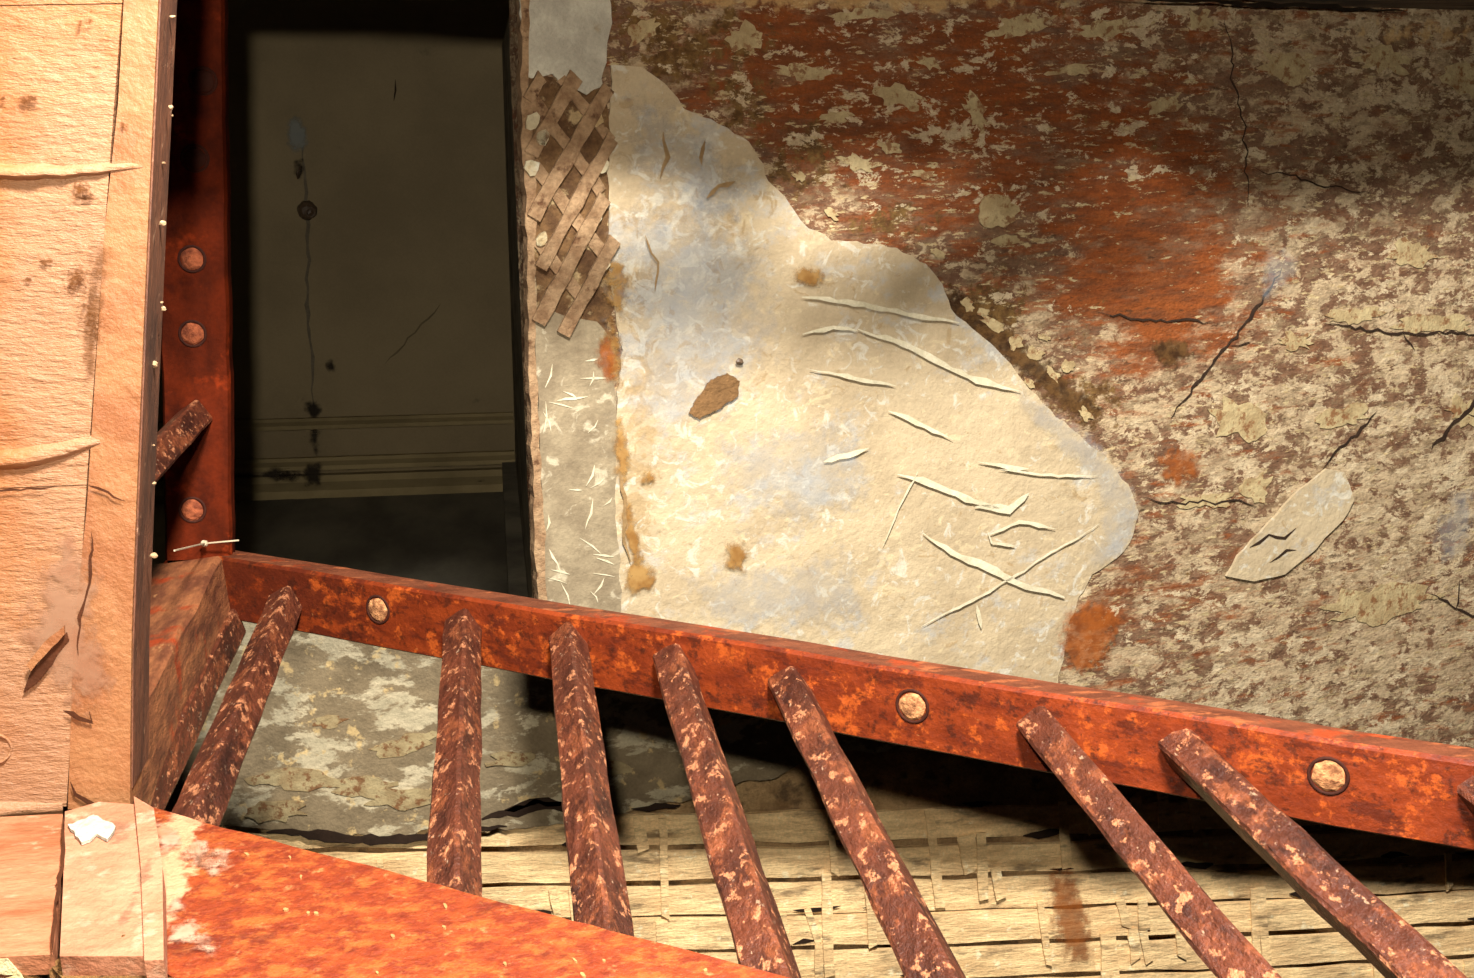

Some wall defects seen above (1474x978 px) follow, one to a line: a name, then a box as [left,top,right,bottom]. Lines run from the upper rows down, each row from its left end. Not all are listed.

peeling [1187,9,1214,32]
peeling [1257,50,1315,86]
peeling [1351,44,1413,76]
peeling [1144,92,1182,115]
crack [1146,0,1407,205]
peeling [516,0,1144,683]
crack [1098,268,1282,418]
crack [1334,324,1474,350]
crack [1323,411,1377,469]
crack [1431,400,1474,450]
crack [77,533,94,655]
corrosion [1061,602,1118,670]